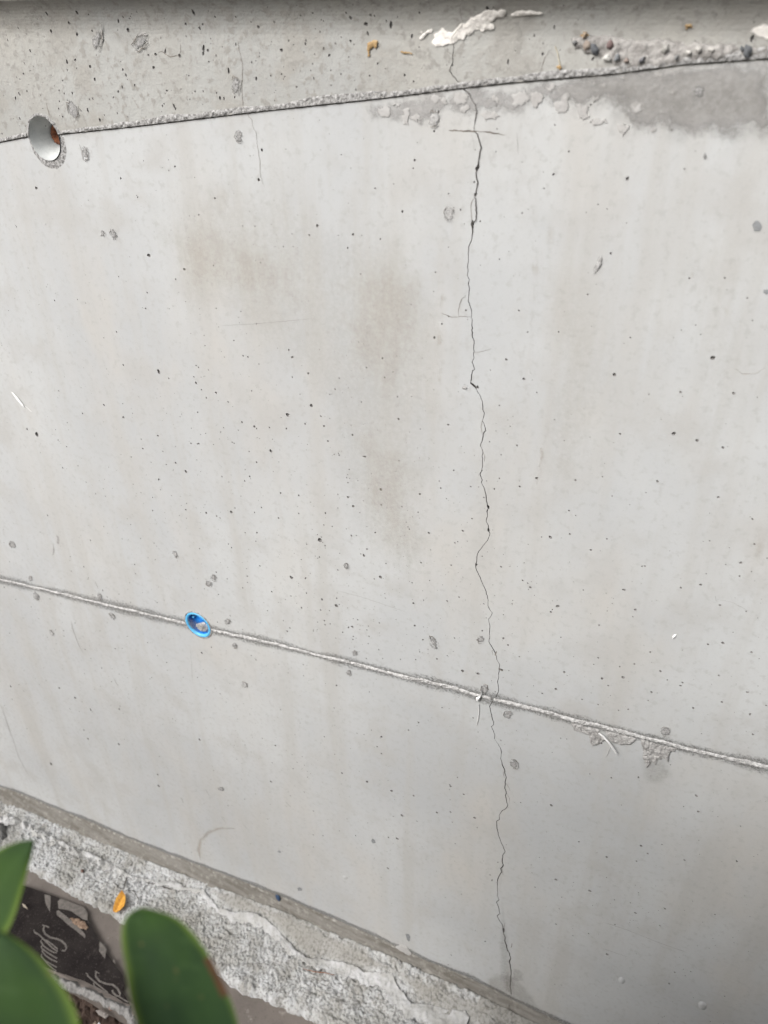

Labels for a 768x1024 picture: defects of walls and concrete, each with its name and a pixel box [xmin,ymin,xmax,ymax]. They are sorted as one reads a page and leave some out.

rust [51,125,60,145]
crack [442,13,512,1009]
peeling [571,722,677,768]